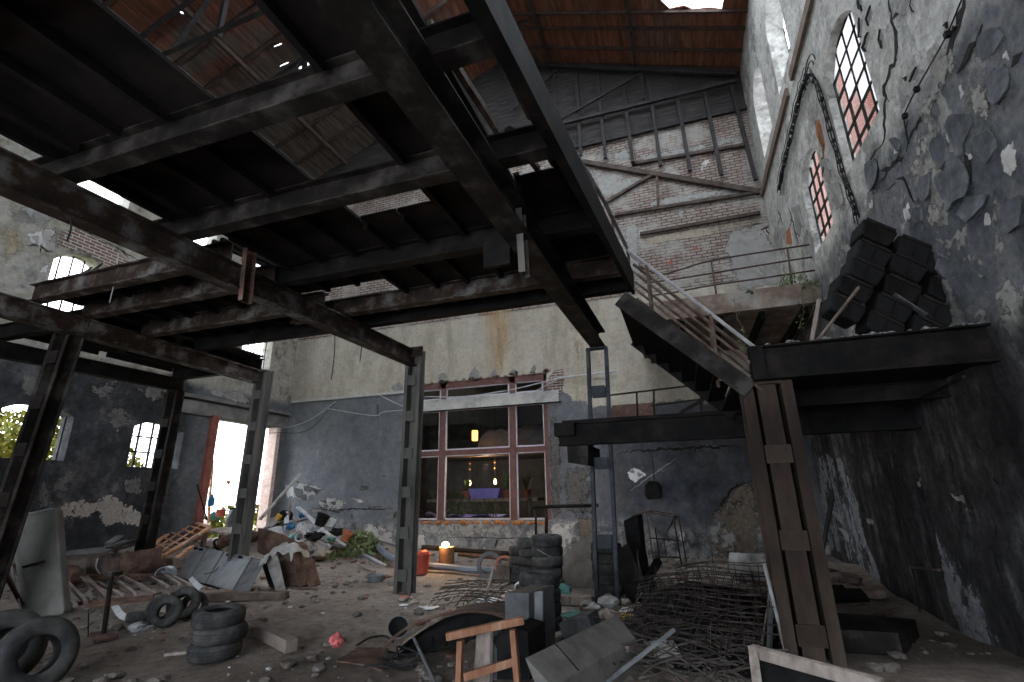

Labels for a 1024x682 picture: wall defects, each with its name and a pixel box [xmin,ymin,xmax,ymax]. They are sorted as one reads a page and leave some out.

peeling [856,0,884,52]
crack [870,0,983,203]
peeling [902,45,1024,234]
peeling [864,158,879,208]
flaking render [9,207,129,267]
peeling [89,380,132,432]
peeling [138,386,166,402]
peeling [294,482,368,510]
spalling [623,484,780,658]
water stain [936,534,1000,648]